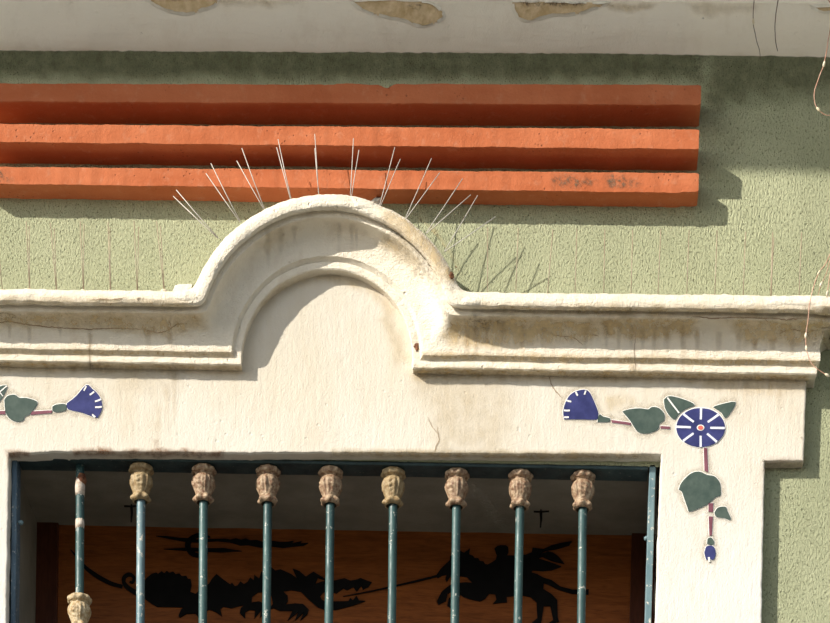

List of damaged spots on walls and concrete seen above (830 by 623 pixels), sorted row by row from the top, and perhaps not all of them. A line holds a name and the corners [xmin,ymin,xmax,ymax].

peeling [146,0,221,16]
peeling [350,0,446,28]
peeling [511,0,611,23]
water stain [594,307,692,338]
crack [0,321,181,367]